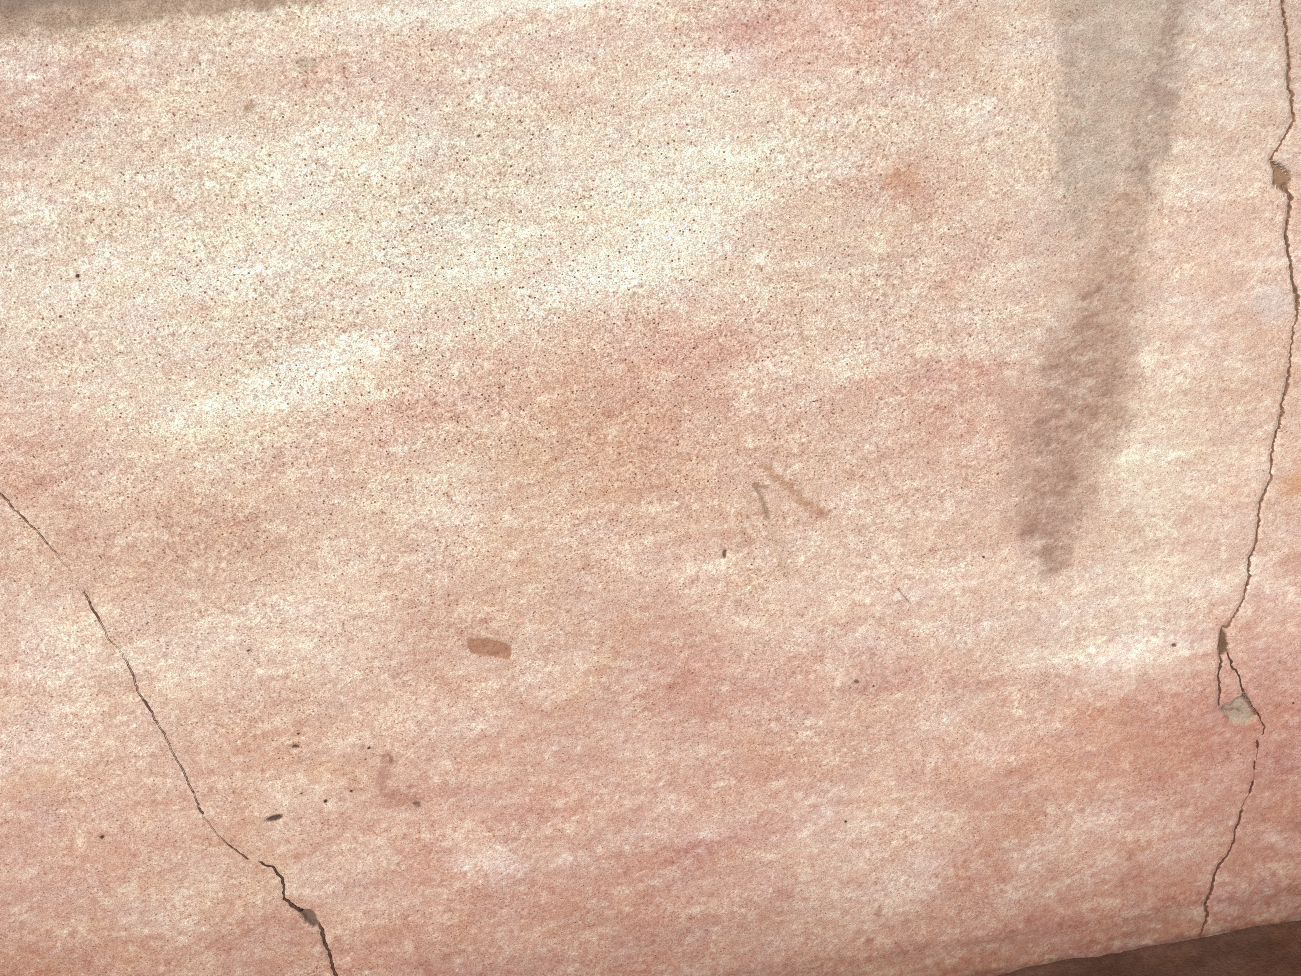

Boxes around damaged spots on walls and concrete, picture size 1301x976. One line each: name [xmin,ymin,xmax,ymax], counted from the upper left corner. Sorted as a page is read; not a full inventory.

crack [0,494,337,976]
leakage [990,0,1205,586]
crack [1081,0,1300,958]
leakage [1246,280,1296,327]